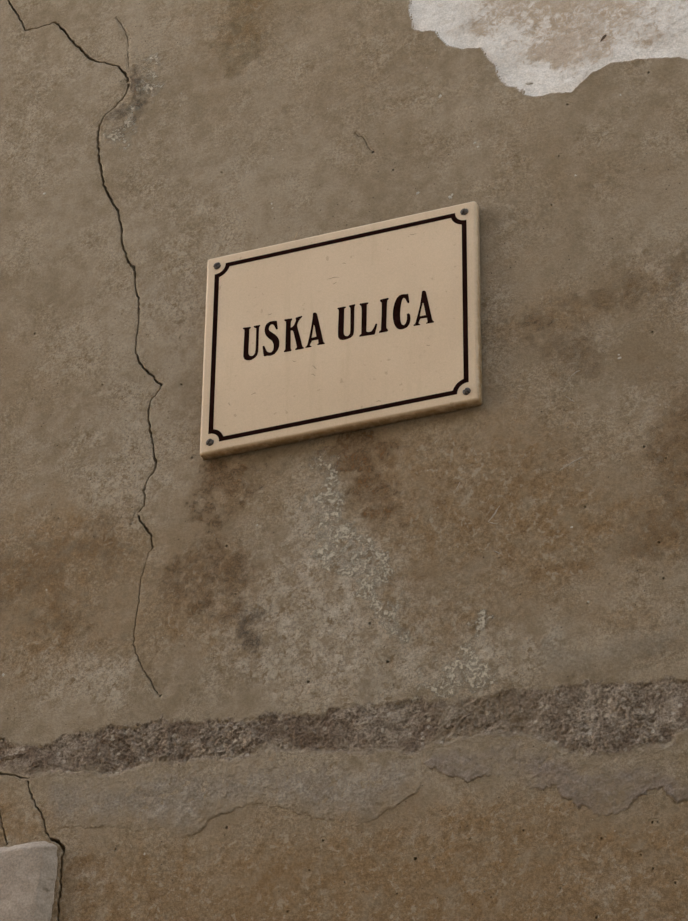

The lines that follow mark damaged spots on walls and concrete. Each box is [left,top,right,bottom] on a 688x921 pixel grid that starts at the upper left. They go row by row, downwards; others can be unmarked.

flaking render [406,0,688,107]
crack [5,0,164,698]
flaking render [0,671,688,782]
crack [0,771,68,921]